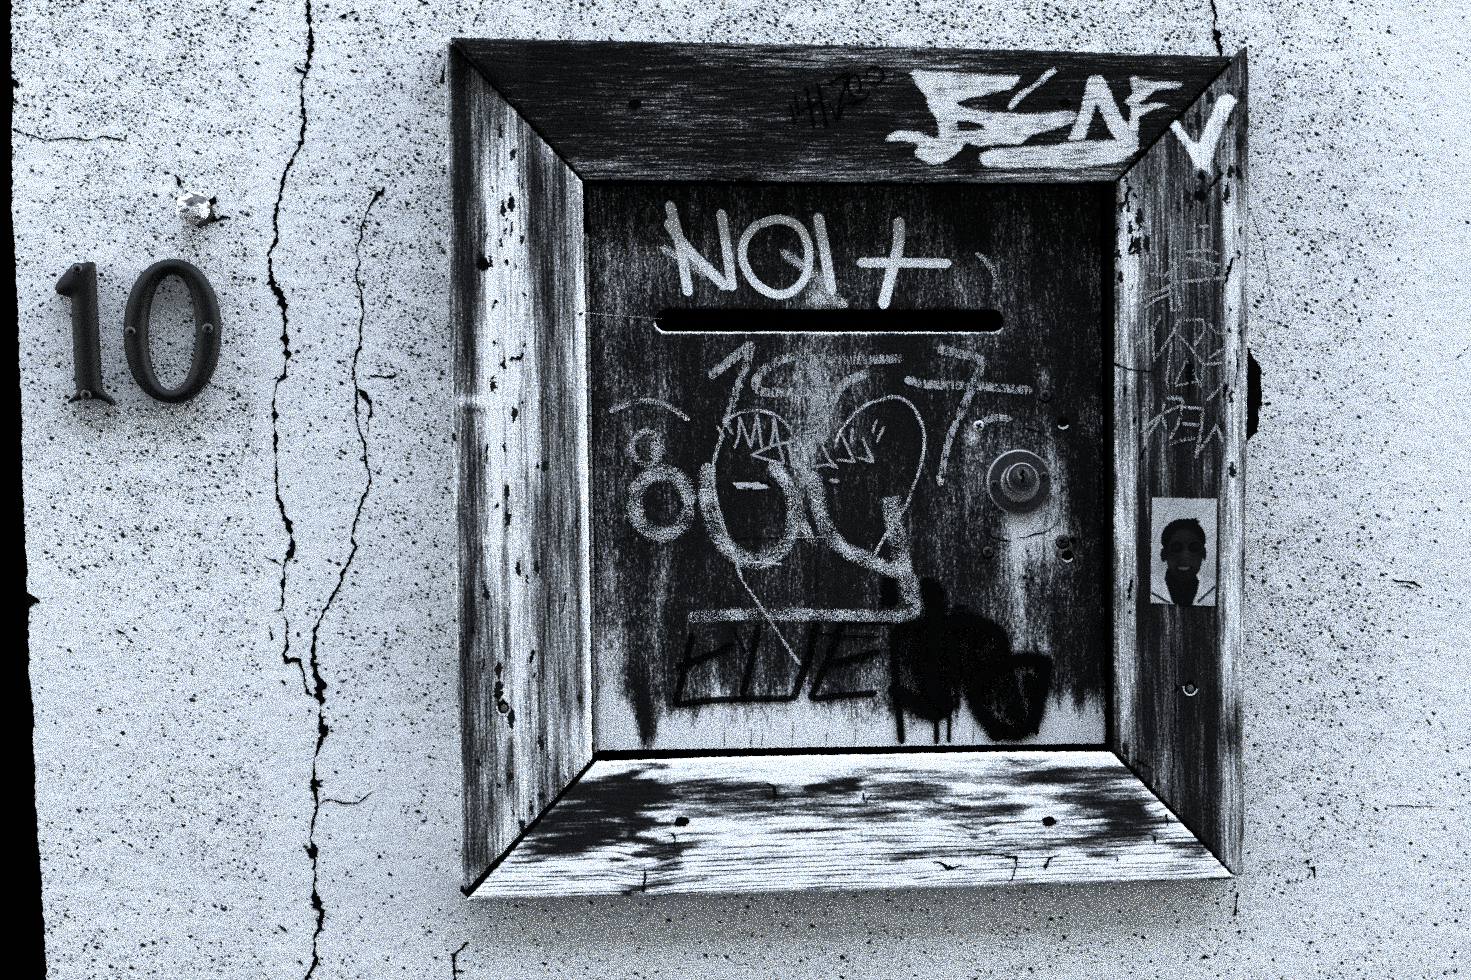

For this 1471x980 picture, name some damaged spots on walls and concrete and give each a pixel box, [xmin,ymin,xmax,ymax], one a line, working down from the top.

crack [1210,0,1223,56]
crack [13,128,126,141]
crack [263,0,399,980]
crack [452,942,469,980]